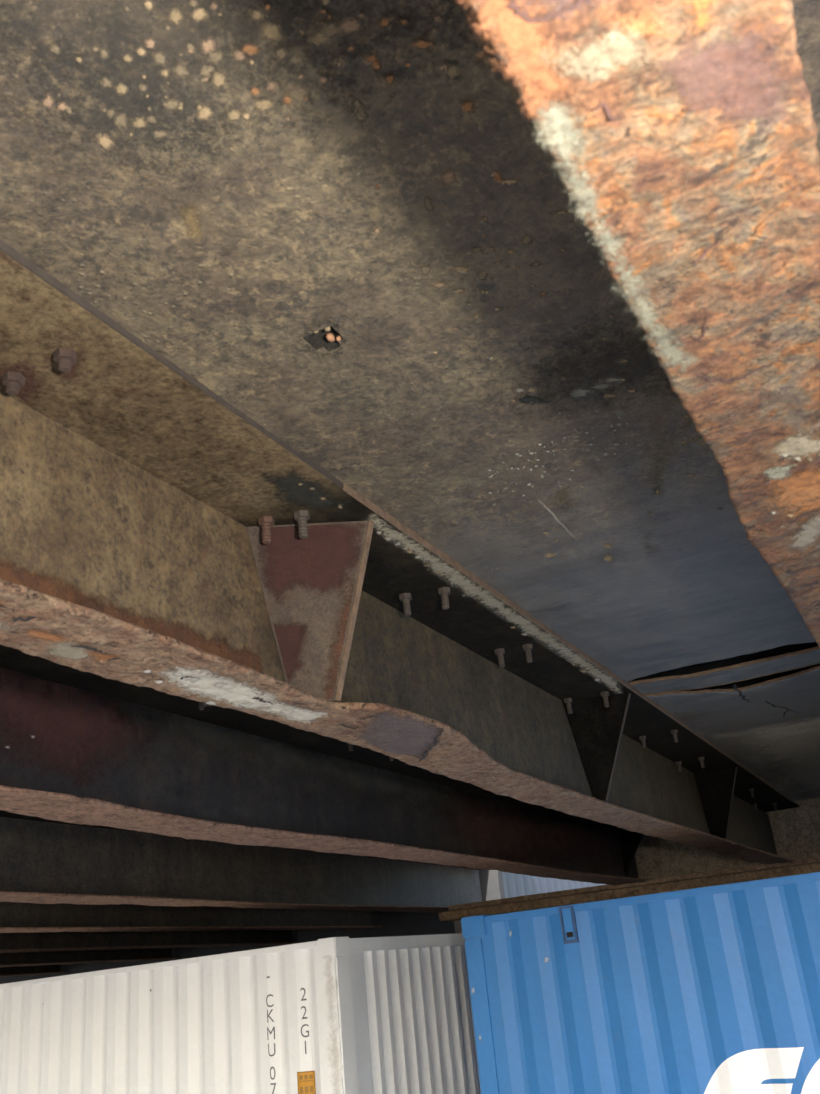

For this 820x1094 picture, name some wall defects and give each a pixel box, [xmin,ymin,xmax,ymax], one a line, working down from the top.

leakage [0,0,478,189]
rust [473,0,604,121]
rust [607,3,668,37]
spalling [295,317,347,357]
leakage [532,326,670,411]
rust [766,469,820,517]
rust [0,560,263,673]
rust [259,523,365,699]
rust [0,669,141,783]
crack [630,647,820,718]